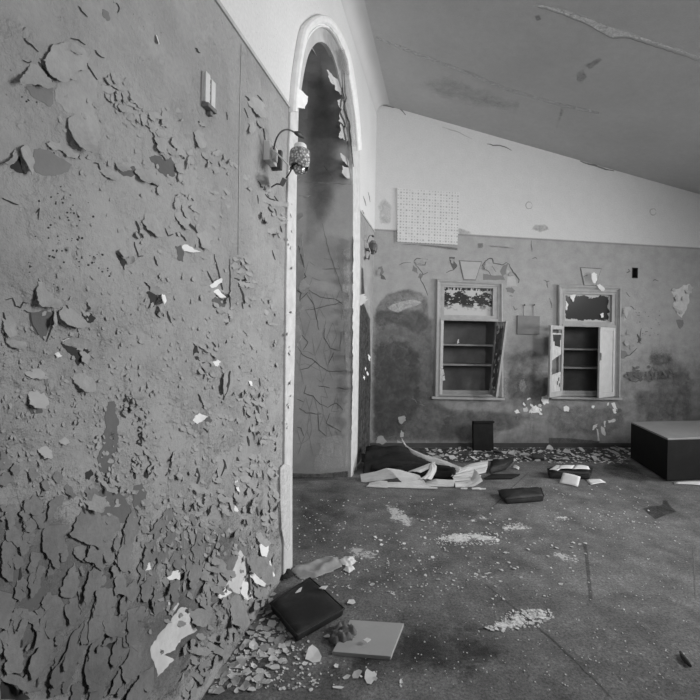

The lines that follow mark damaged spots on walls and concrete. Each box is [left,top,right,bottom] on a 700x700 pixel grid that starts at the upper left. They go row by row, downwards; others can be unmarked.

crack [538,7,697,61]
peeling [5,27,255,323]
peeling [25,368,50,414]
peeling [6,278,102,393]
peeling [193,342,231,404]
peeling [257,181,310,356]
crack [297,224,354,458]
water stain [358,300,474,463]
spalling [514,379,570,415]
spalling [592,402,622,441]
peeling [671,284,694,328]
peeling [0,378,290,700]